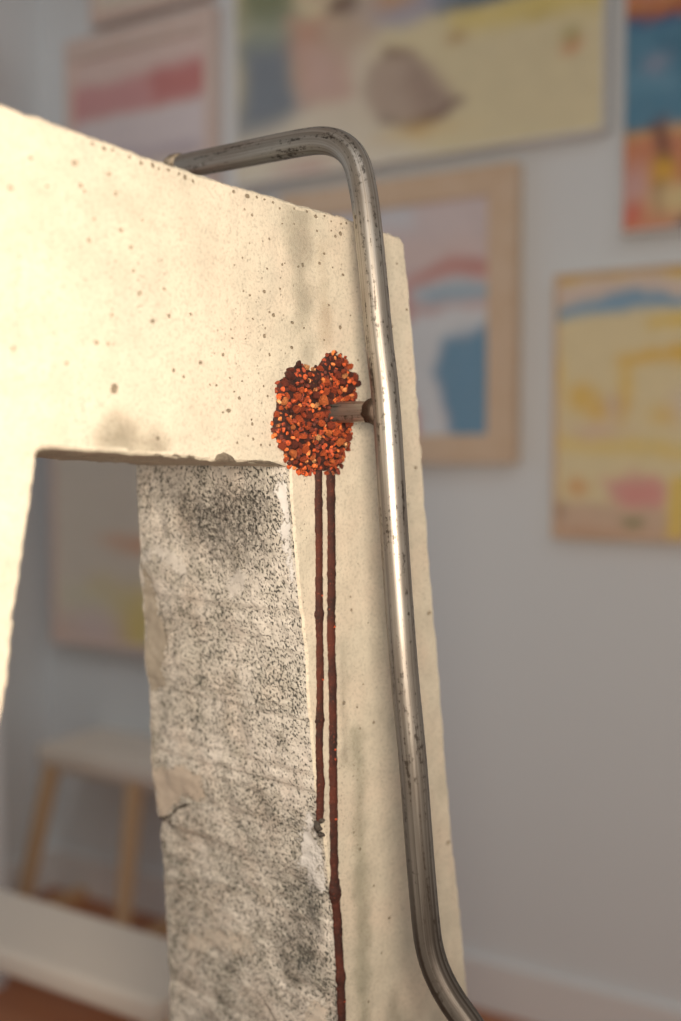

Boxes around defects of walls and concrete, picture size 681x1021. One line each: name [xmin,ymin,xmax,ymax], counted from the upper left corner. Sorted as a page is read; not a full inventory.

spalling [214,452,283,466]
spalling [140,559,169,700]
rust [270,350,361,1021]
spalling [152,761,206,817]